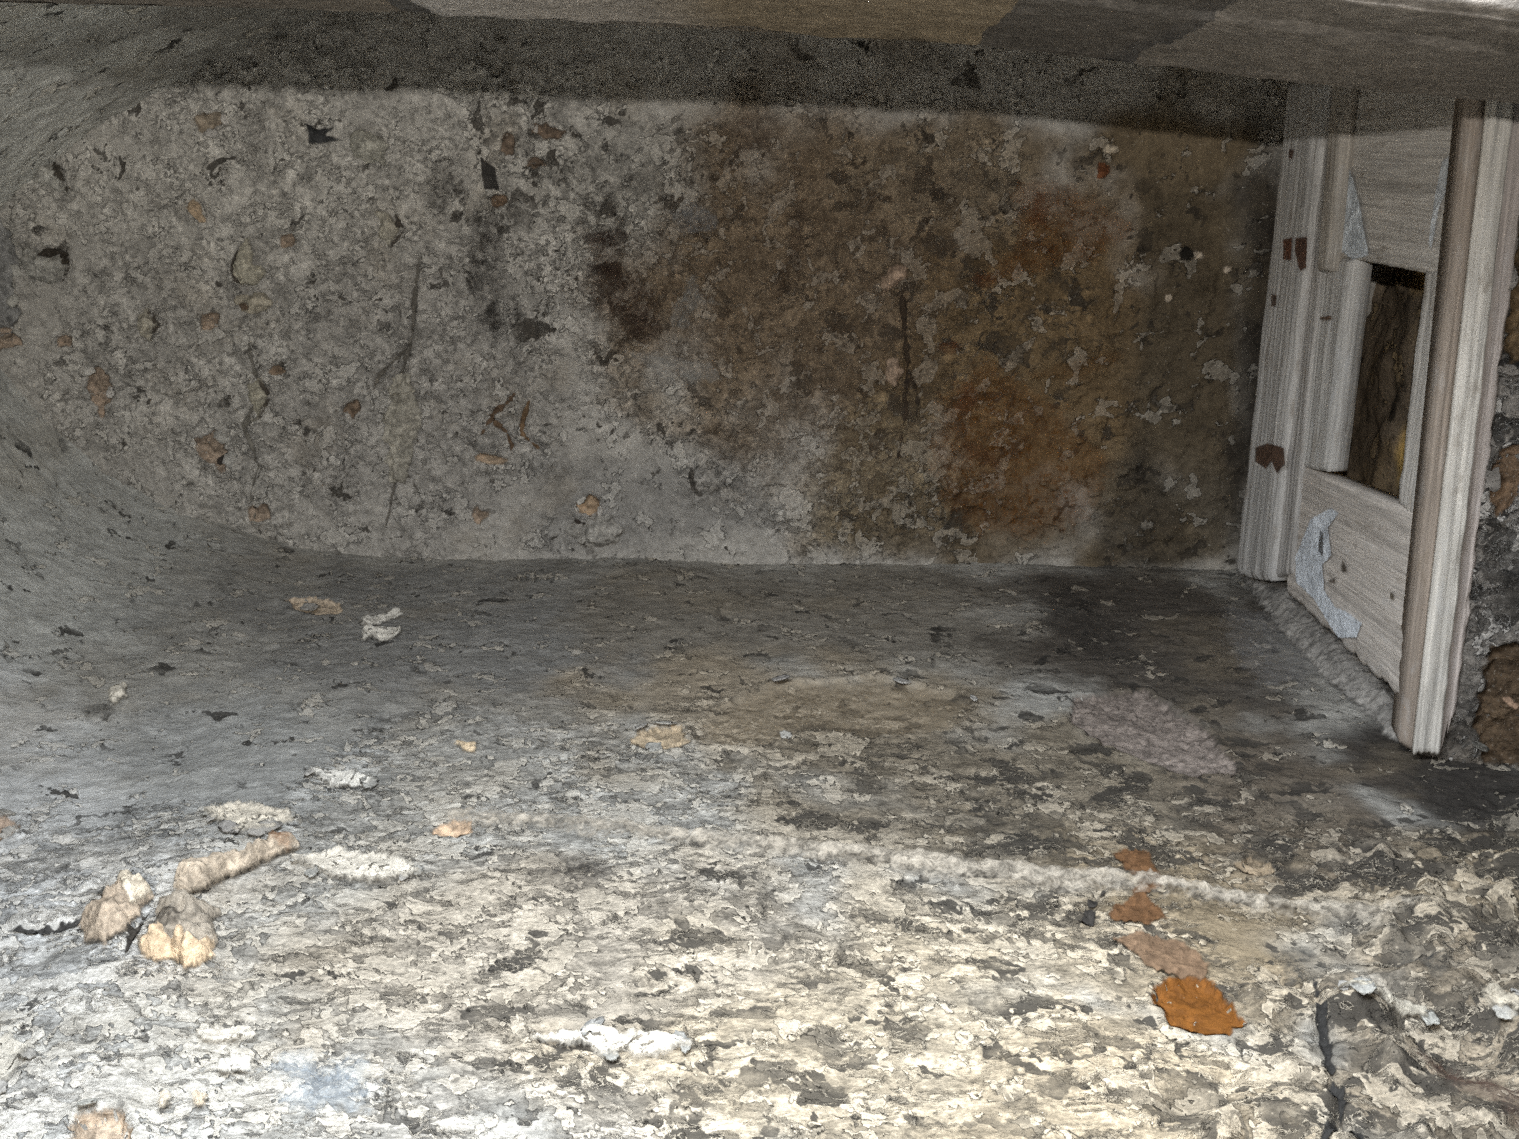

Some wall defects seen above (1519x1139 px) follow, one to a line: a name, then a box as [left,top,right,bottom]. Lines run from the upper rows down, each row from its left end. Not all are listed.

rust [1097,163,1110,179]